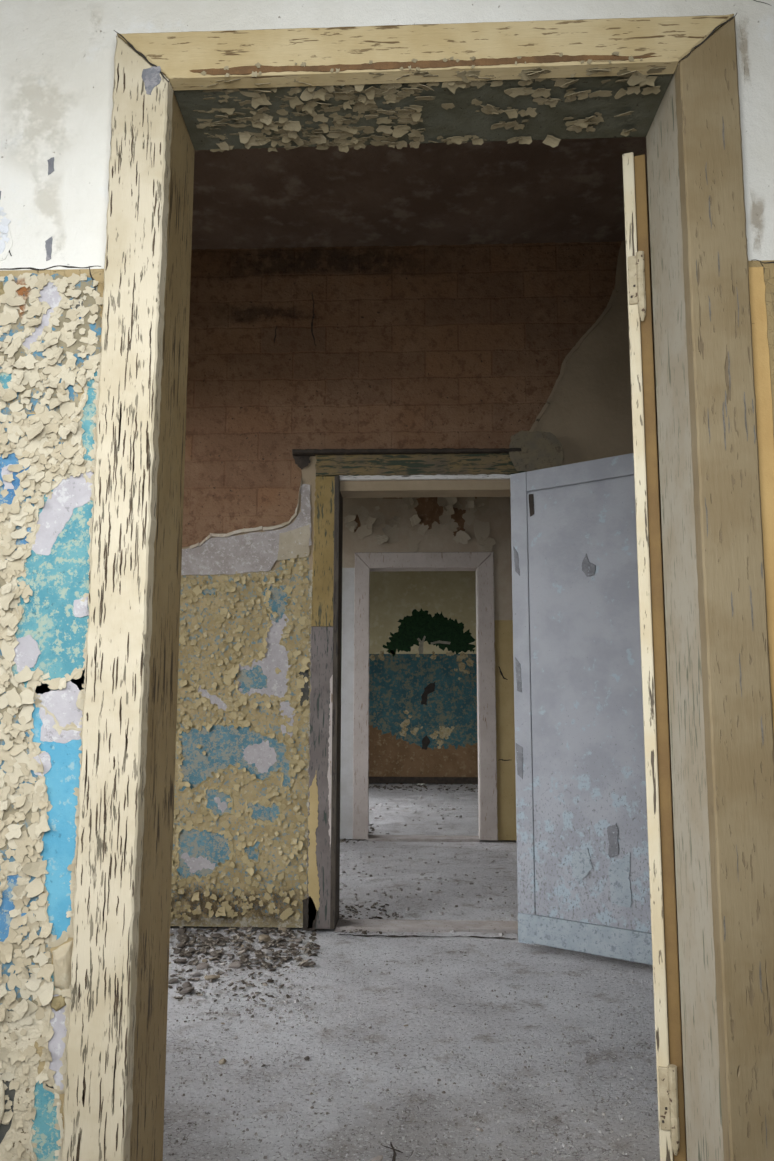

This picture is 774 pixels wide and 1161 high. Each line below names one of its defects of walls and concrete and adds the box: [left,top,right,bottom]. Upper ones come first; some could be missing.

peeling [110,66,161,256]
peeling [193,52,666,153]
spalling [182,240,626,549]
peeling [0,237,154,1161]
peeling [170,551,311,923]
crack [382,1142,403,1161]